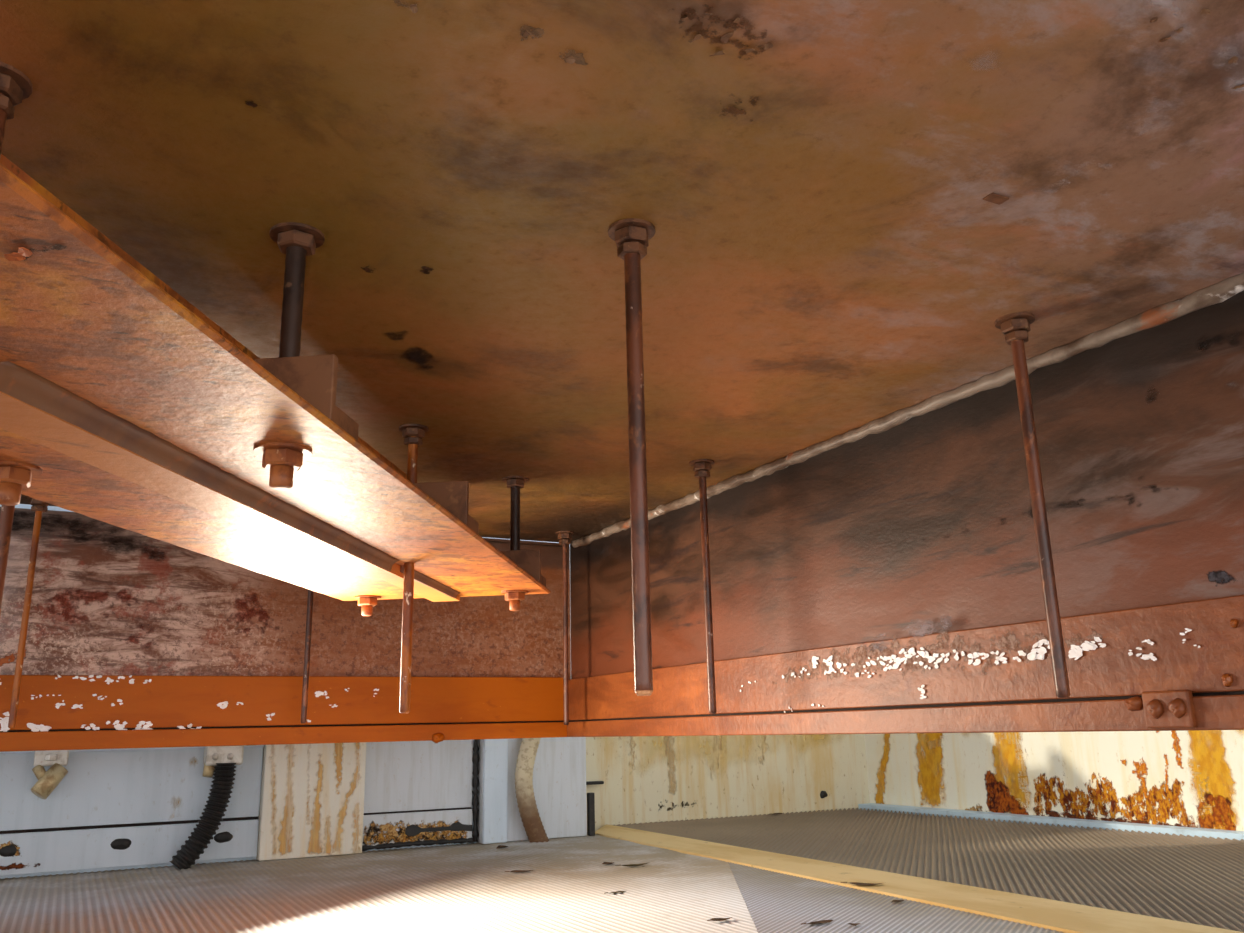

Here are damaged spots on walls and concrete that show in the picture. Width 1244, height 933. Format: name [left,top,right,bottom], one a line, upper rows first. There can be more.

corrosion [679,5,773,59]
corrosion [386,333,433,369]
water stain [12,512,165,561]
peeling [773,632,1051,699]
peeling [1064,630,1106,660]
peeling [1128,639,1157,661]
peeling [0,712,10,732]
peeling [27,723,51,732]
peeling [31,675,153,730]
corrosion [308,742,473,854]
corrosion [916,733,944,806]
corrosion [966,730,1237,831]